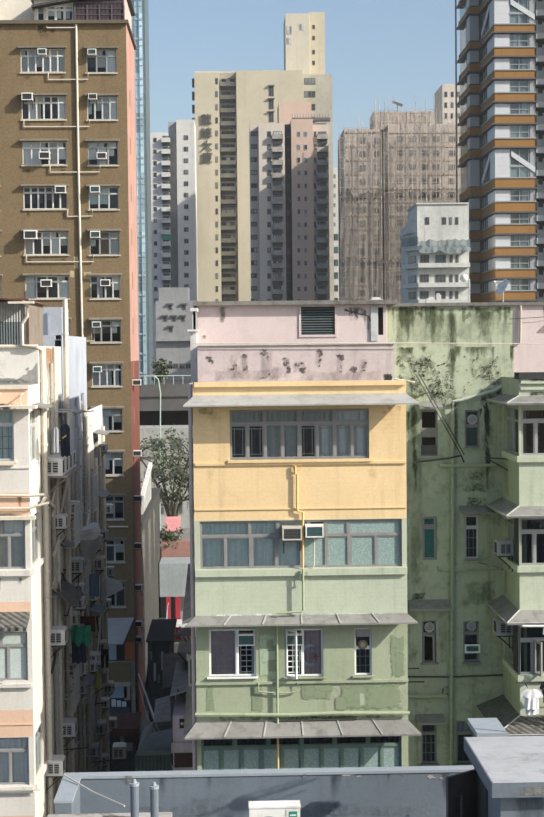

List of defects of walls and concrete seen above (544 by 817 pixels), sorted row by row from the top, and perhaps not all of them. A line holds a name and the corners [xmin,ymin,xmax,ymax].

damp [393,306,510,370]